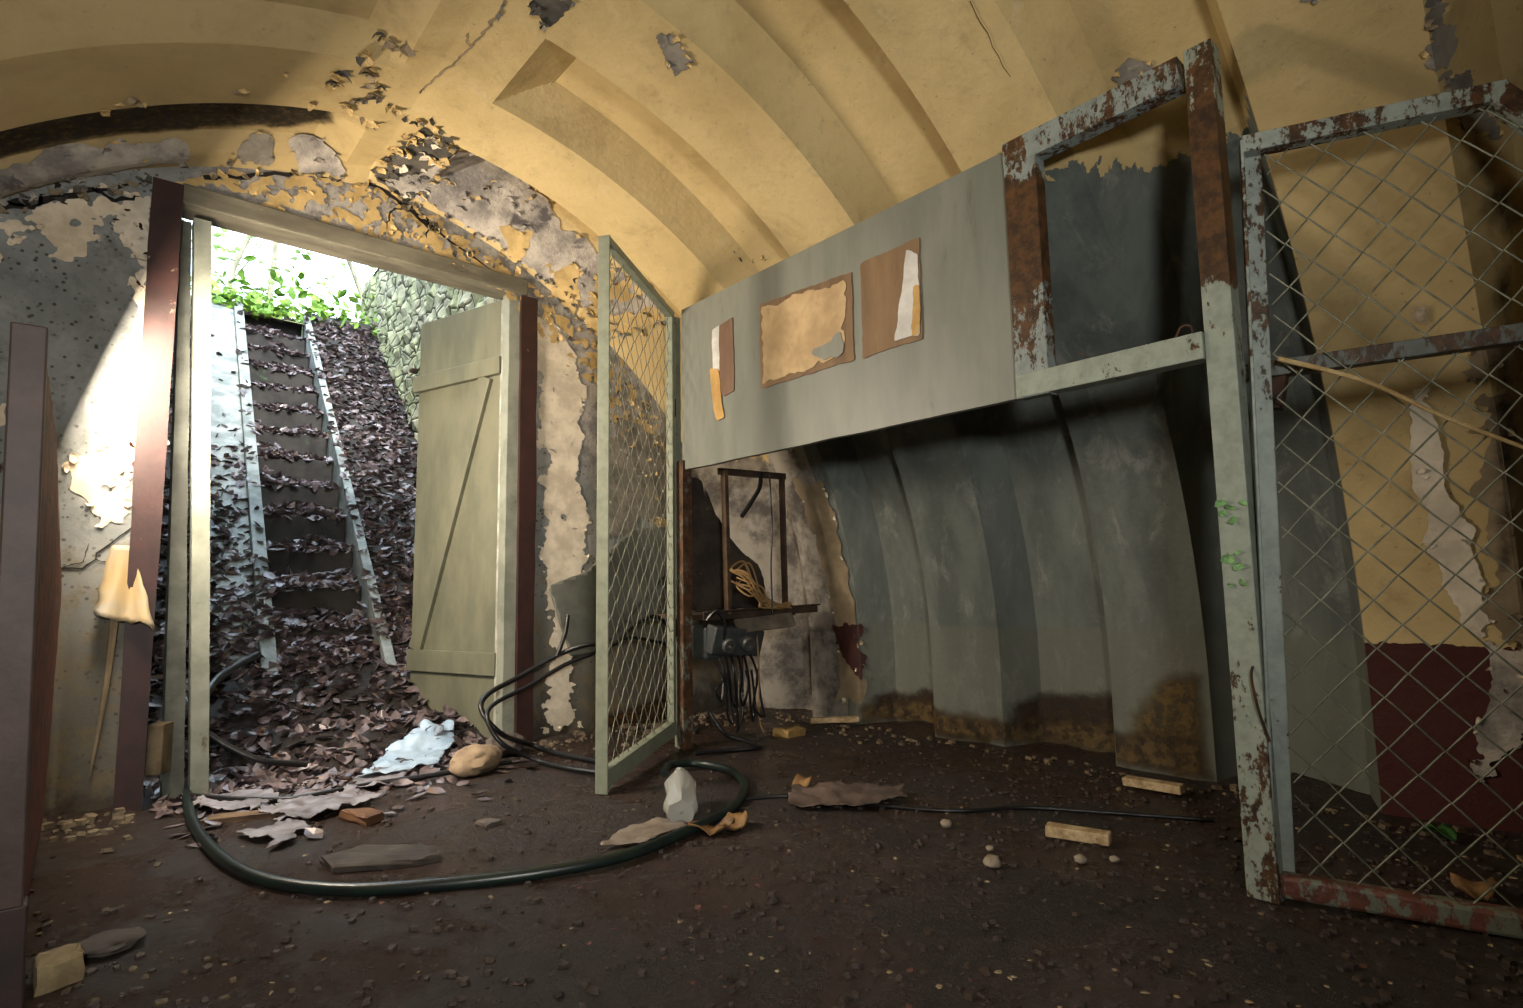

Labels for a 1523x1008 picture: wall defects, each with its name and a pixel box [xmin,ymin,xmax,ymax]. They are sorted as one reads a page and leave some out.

crack [418,0,506,94]
peeling [527,0,576,32]
peeling [656,31,694,76]
crack [969,0,1011,77]
peeling [1420,0,1473,92]
spalling [0,32,667,734]
peeling [88,545,155,777]
damp [860,676,1210,778]